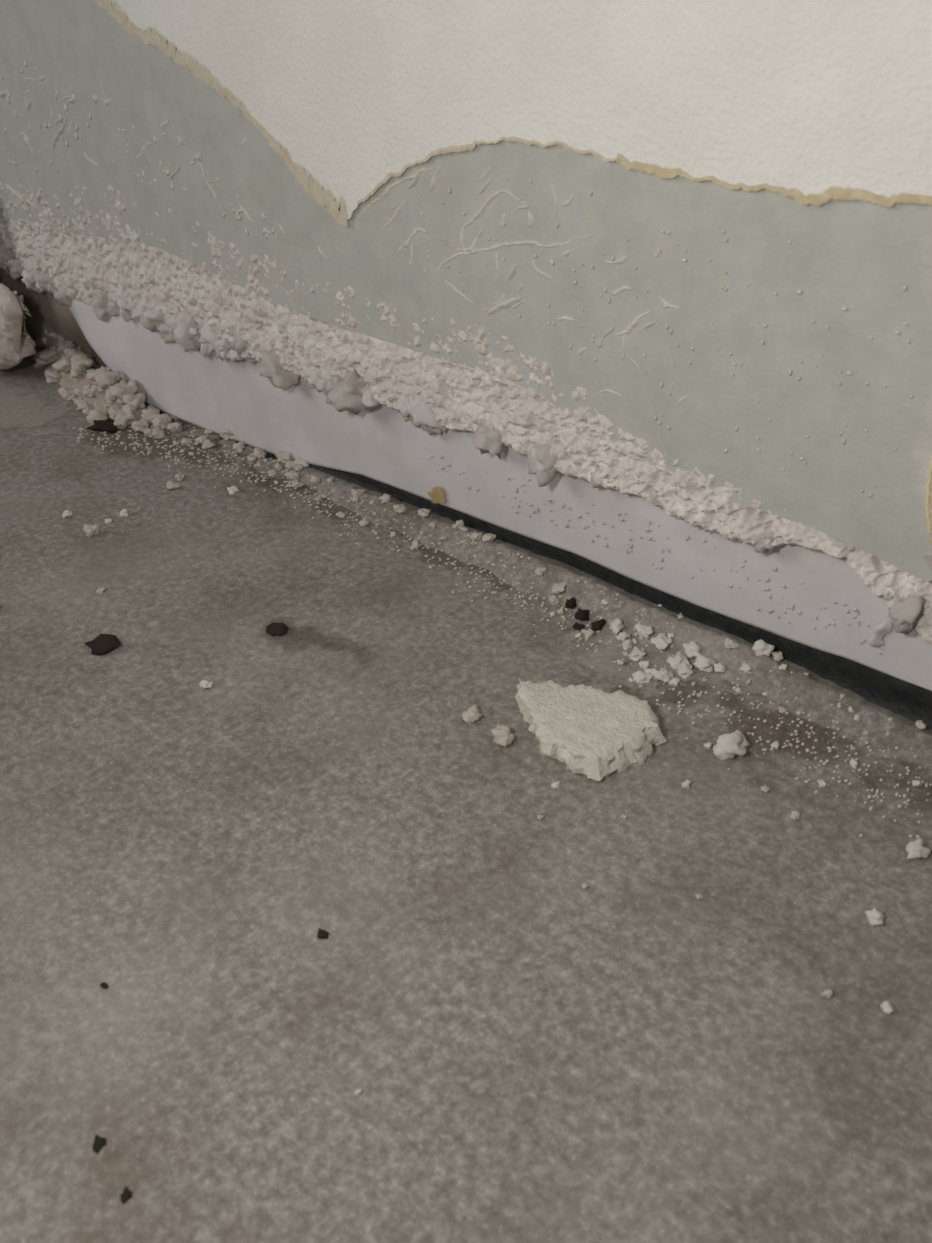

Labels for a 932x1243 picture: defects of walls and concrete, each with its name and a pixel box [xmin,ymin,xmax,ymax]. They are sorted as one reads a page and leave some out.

leakage [427,487,445,504]
peeling [0,0,932,646]